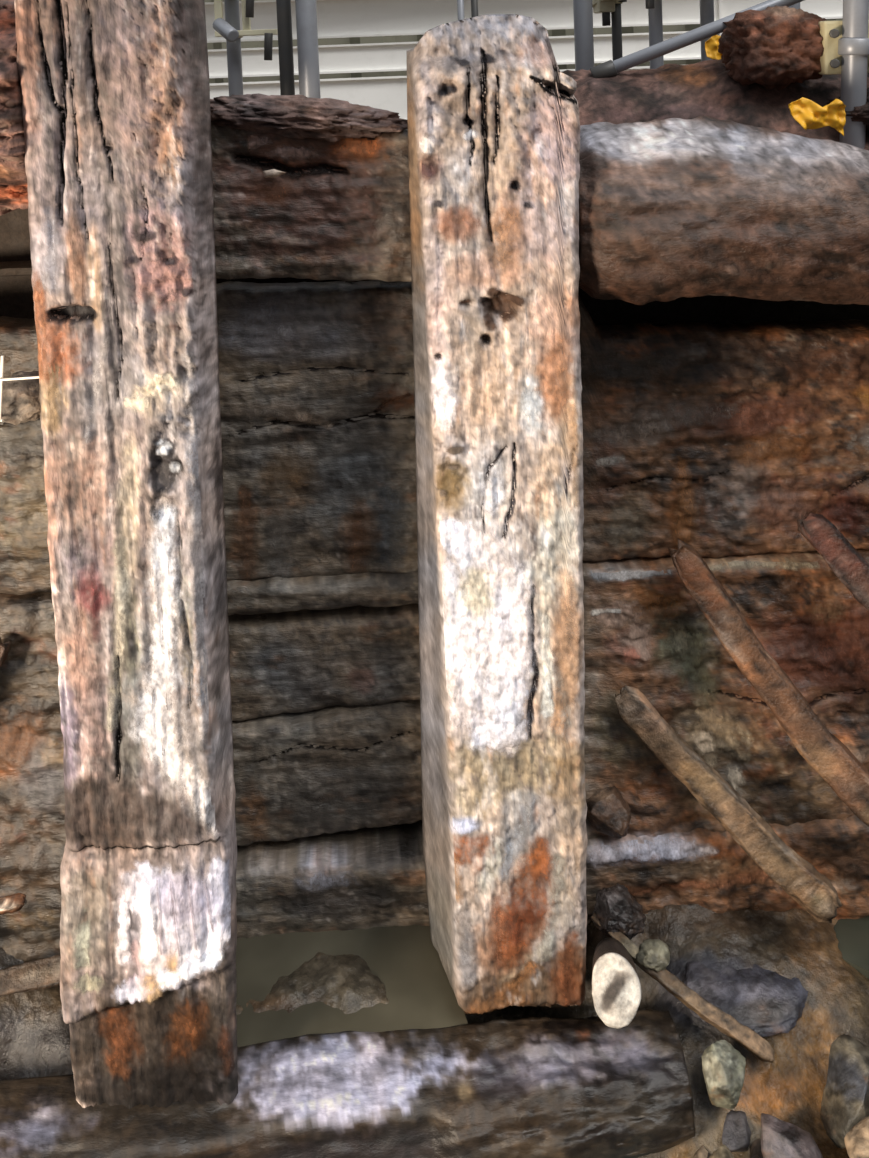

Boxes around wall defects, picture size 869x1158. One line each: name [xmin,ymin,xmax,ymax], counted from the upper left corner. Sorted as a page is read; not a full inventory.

crack [529,76,577,104]
crack [466,51,500,242]
crack [37,0,124,398]
crack [140,186,148,260]
crack [481,442,517,540]